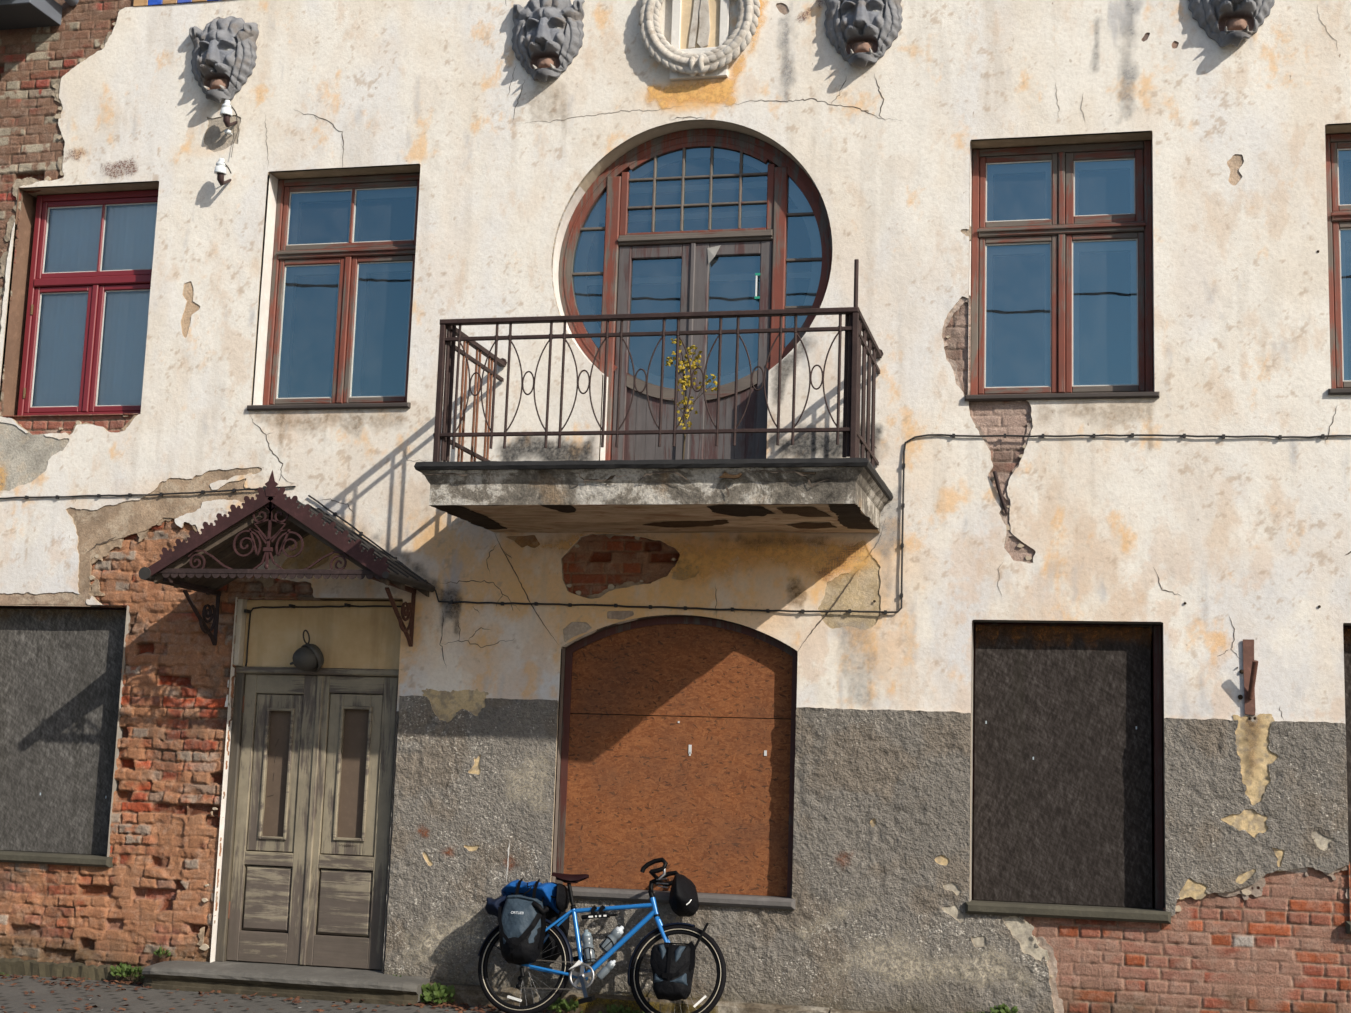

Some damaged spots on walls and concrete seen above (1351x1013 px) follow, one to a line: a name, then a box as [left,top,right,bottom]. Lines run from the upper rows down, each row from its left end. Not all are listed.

damp [648,57,744,109]
crack [508,68,893,124]
flaking render [0,0,134,333]
flaking render [181,282,200,338]
flaking render [0,365,140,491]
flaking render [942,295,1036,563]
spalling [429,505,540,548]
crack [440,537,556,665]
flaking render [562,505,881,630]
flaking render [0,467,321,967]
peeling [1221,714,1279,838]
flaking render [1002,848,1351,1013]